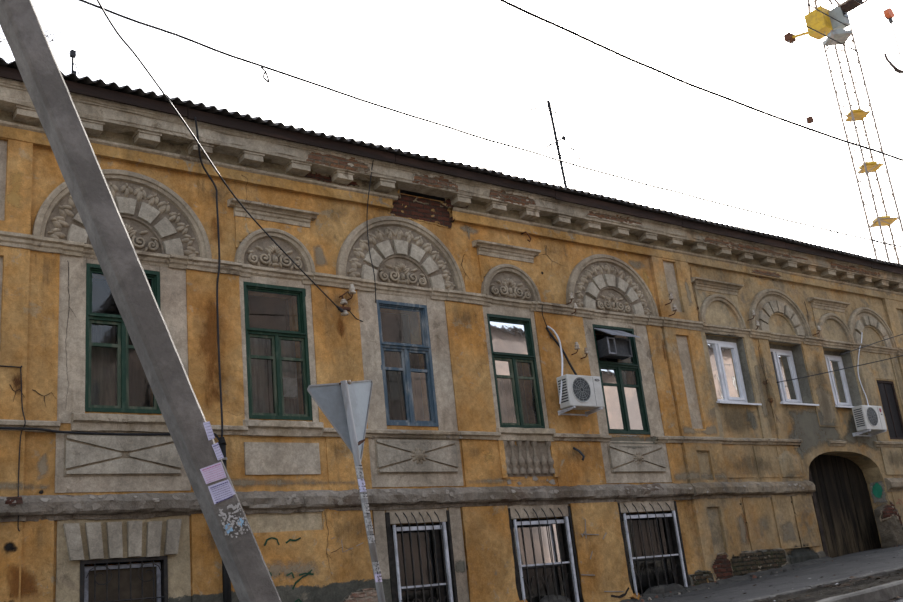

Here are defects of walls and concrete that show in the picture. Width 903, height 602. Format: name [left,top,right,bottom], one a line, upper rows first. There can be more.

flaking render [304,151,370,189]
flaking render [387,173,469,229]
crack [10,260,80,406]
flaking render [341,588,378,602]
peeling [462,488,527,602]
flaking render [690,548,788,586]